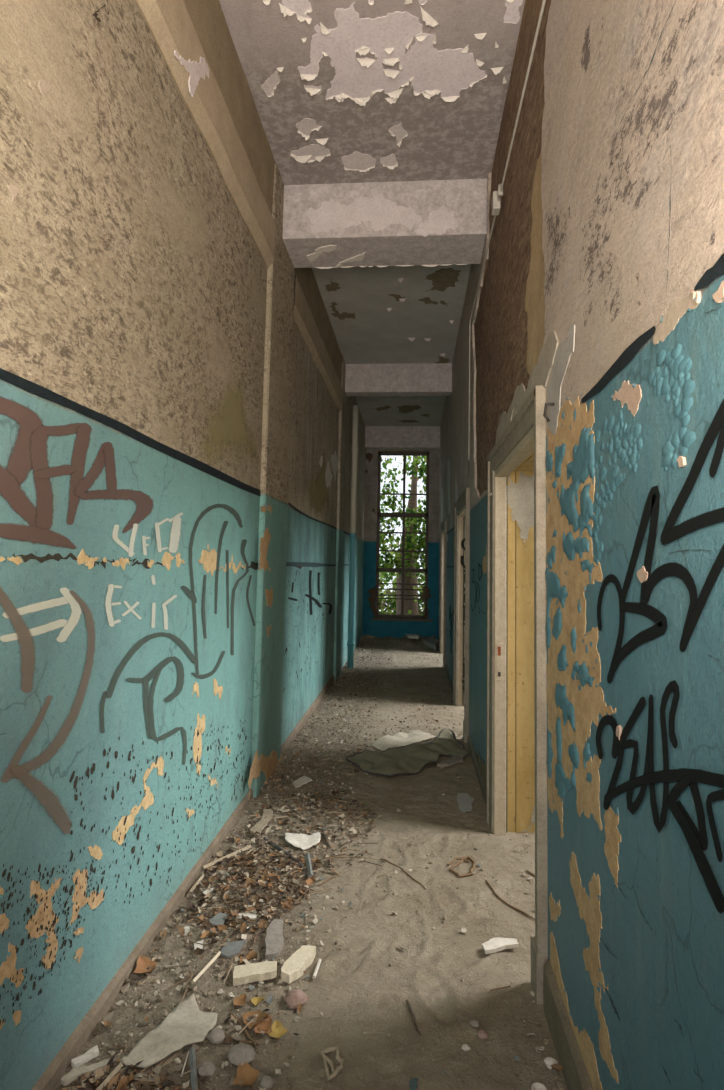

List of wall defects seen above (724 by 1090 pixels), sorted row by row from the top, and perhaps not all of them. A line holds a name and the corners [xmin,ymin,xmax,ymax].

peeling [174,50,209,97]
spalling [261,0,552,496]
flaking render [0,556,23,565]
flaking render [77,547,130,570]
flaking render [148,551,185,571]
flaking render [198,528,271,576]
peeling [213,678,223,700]
peeling [507,396,622,1090]
peeling [0,713,282,1030]